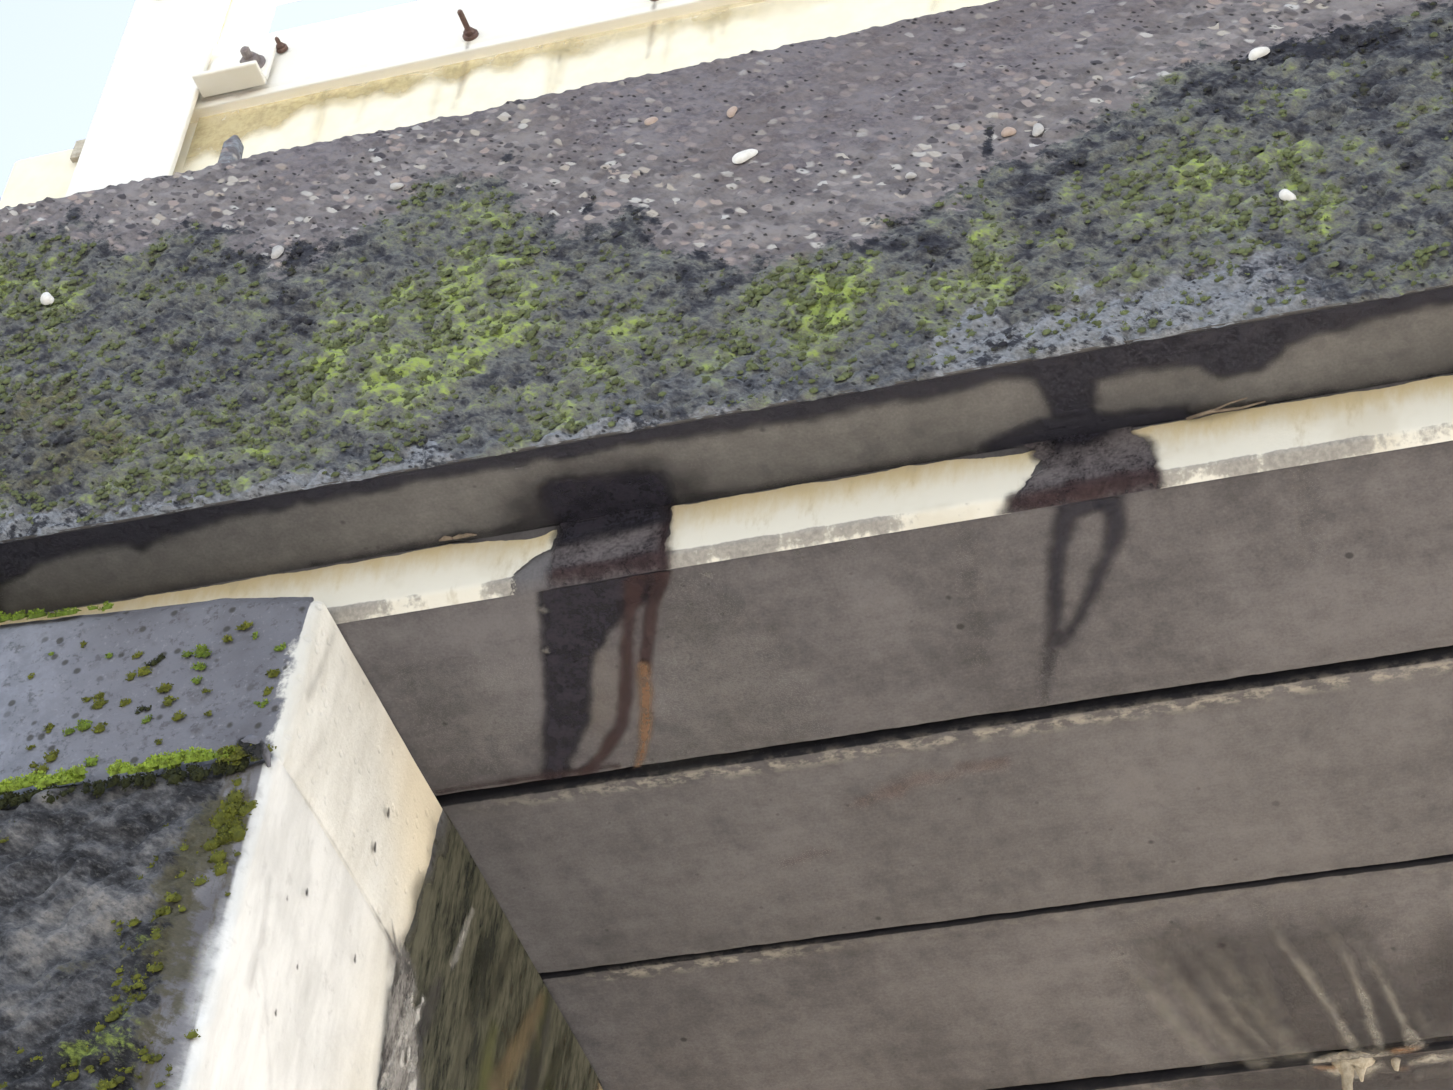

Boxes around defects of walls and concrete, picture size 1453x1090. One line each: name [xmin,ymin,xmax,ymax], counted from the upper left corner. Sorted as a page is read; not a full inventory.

rust [500,463,706,784]
water stain [0,287,1453,658]
water stain [1229,976,1453,1090]